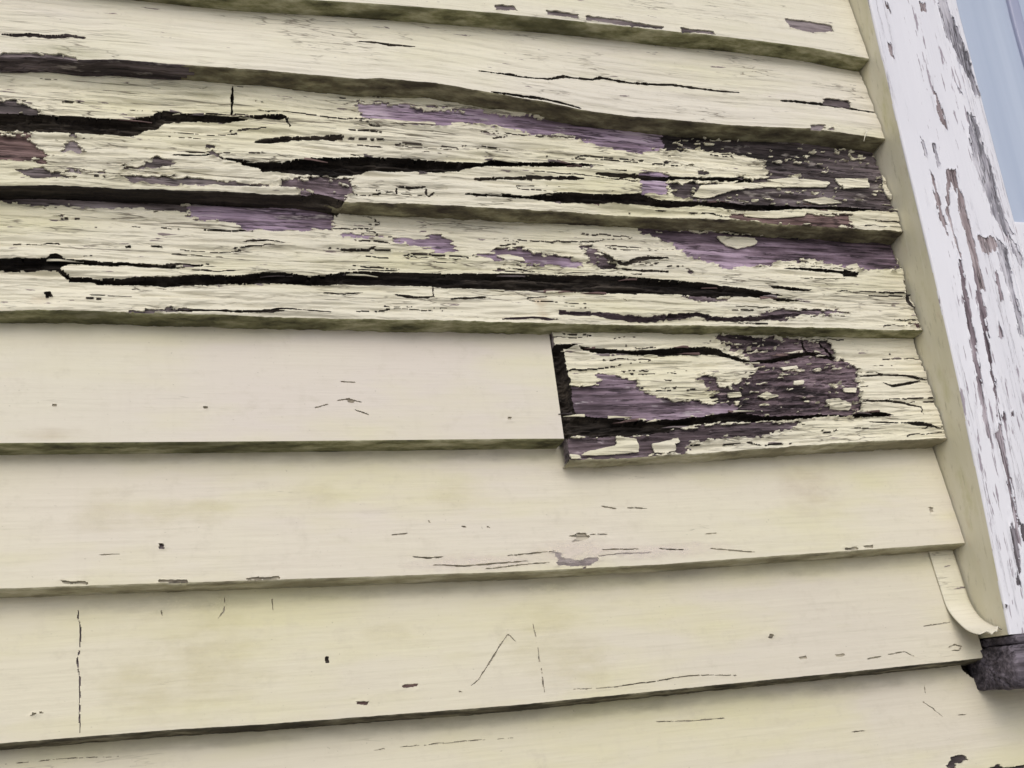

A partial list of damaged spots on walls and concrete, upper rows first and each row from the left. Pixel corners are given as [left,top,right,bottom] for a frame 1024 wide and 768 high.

peeling [0,100,40,115]
peeling [0,133,105,178]
peeling [0,199,458,259]
peeling [122,157,355,201]
crack [0,78,917,392]
crack [479,70,739,109]
peeling [355,99,900,274]
peeling [785,19,832,33]
peeling [919,0,980,96]
peeling [568,334,861,460]
peeling [920,112,1024,586]
crack [75,610,83,727]